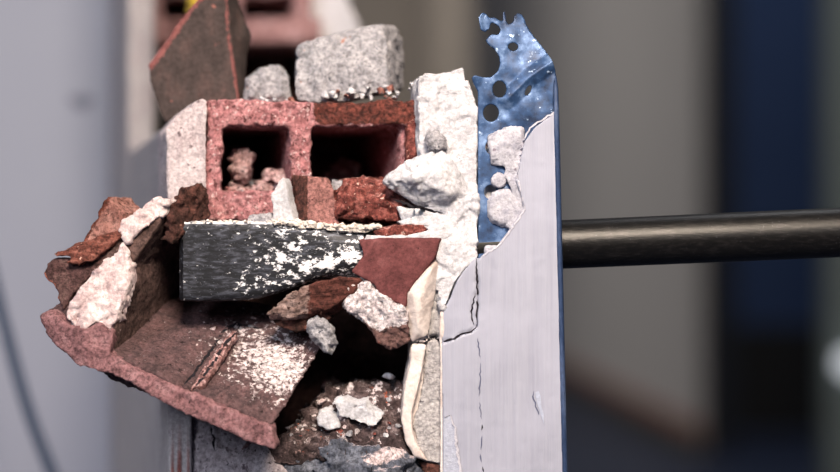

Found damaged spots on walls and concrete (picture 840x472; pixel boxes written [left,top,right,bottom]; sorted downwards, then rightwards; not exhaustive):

spalling [40,99,320,472]
flaking render [317,405,341,430]
crack [414,259,484,472]
peeling [444,415,462,472]
flaking render [365,68,554,312]